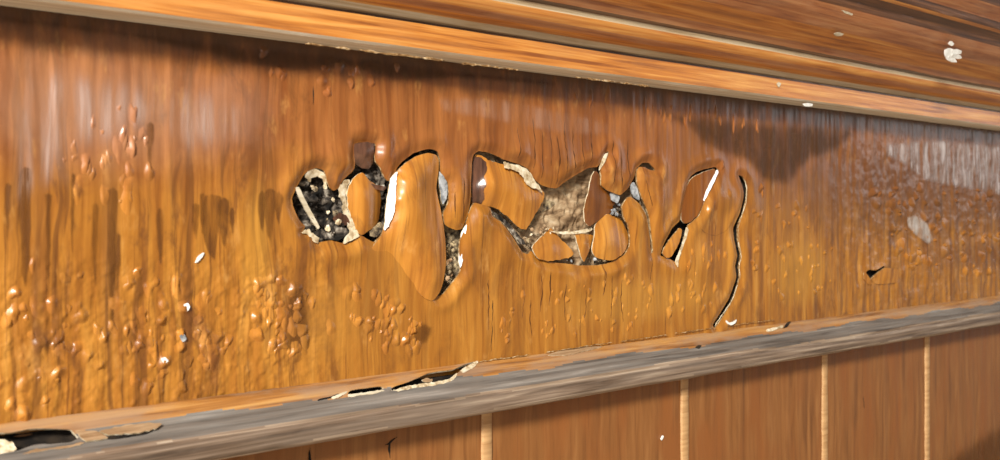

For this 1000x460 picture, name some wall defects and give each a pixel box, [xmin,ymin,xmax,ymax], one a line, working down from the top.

spalling [292,149,439,243]
peeling [436,151,717,296]
crack [713,175,747,327]